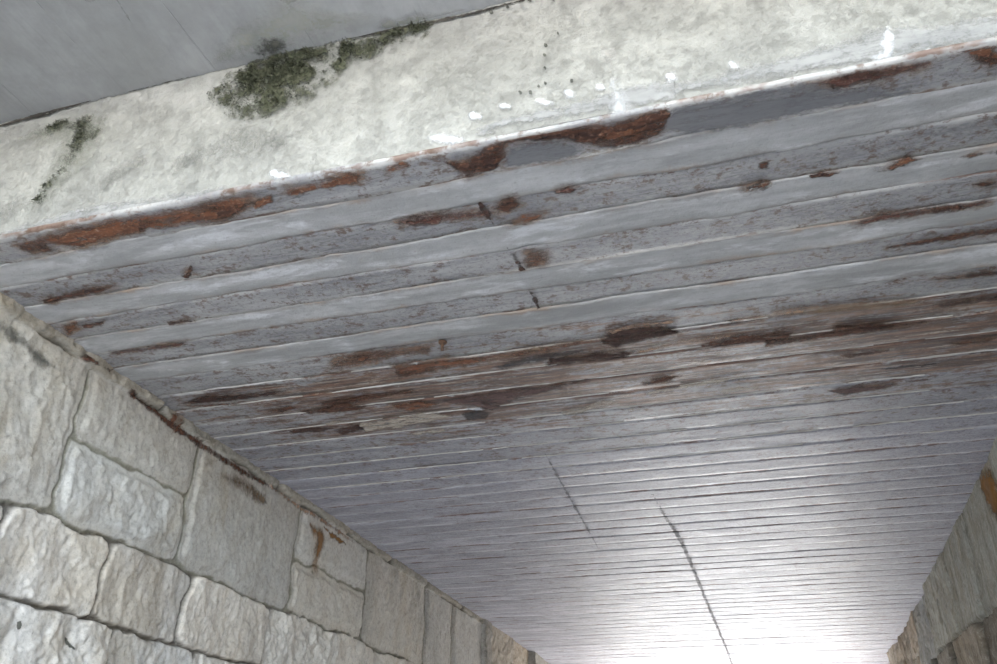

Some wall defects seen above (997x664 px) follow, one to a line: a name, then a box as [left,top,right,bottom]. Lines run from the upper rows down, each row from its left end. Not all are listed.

rust [962,48,997,66]
rust [812,62,929,90]
peeling [662,86,909,133]
peeling [506,144,581,166]
rust [740,162,772,192]
crack [478,202,493,224]
rust [41,285,115,304]
crack [512,254,540,309]
rust [270,299,926,414]
rust [289,424,364,435]
rust [129,389,348,571]
crack [651,494,733,664]